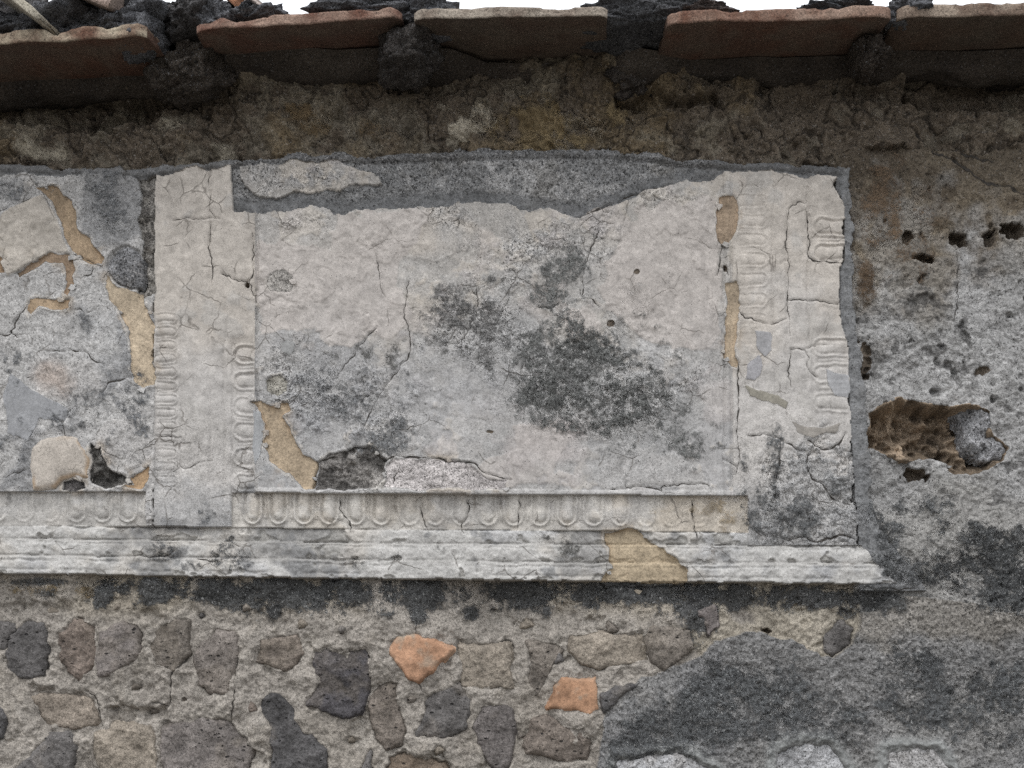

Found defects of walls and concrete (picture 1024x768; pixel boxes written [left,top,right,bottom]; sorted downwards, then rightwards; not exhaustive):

peeling [18,183,156,393]
spalling [63,444,149,491]
crack [176,176,256,298]
spalling [248,375,509,491]
crack [320,246,505,481]
leakage [2,489,1024,650]
leakage [414,242,727,472]
peeling [600,528,688,594]
crack [610,483,709,537]
crack [725,364,851,505]
crack [739,201,840,381]
spalling [866,395,1009,475]